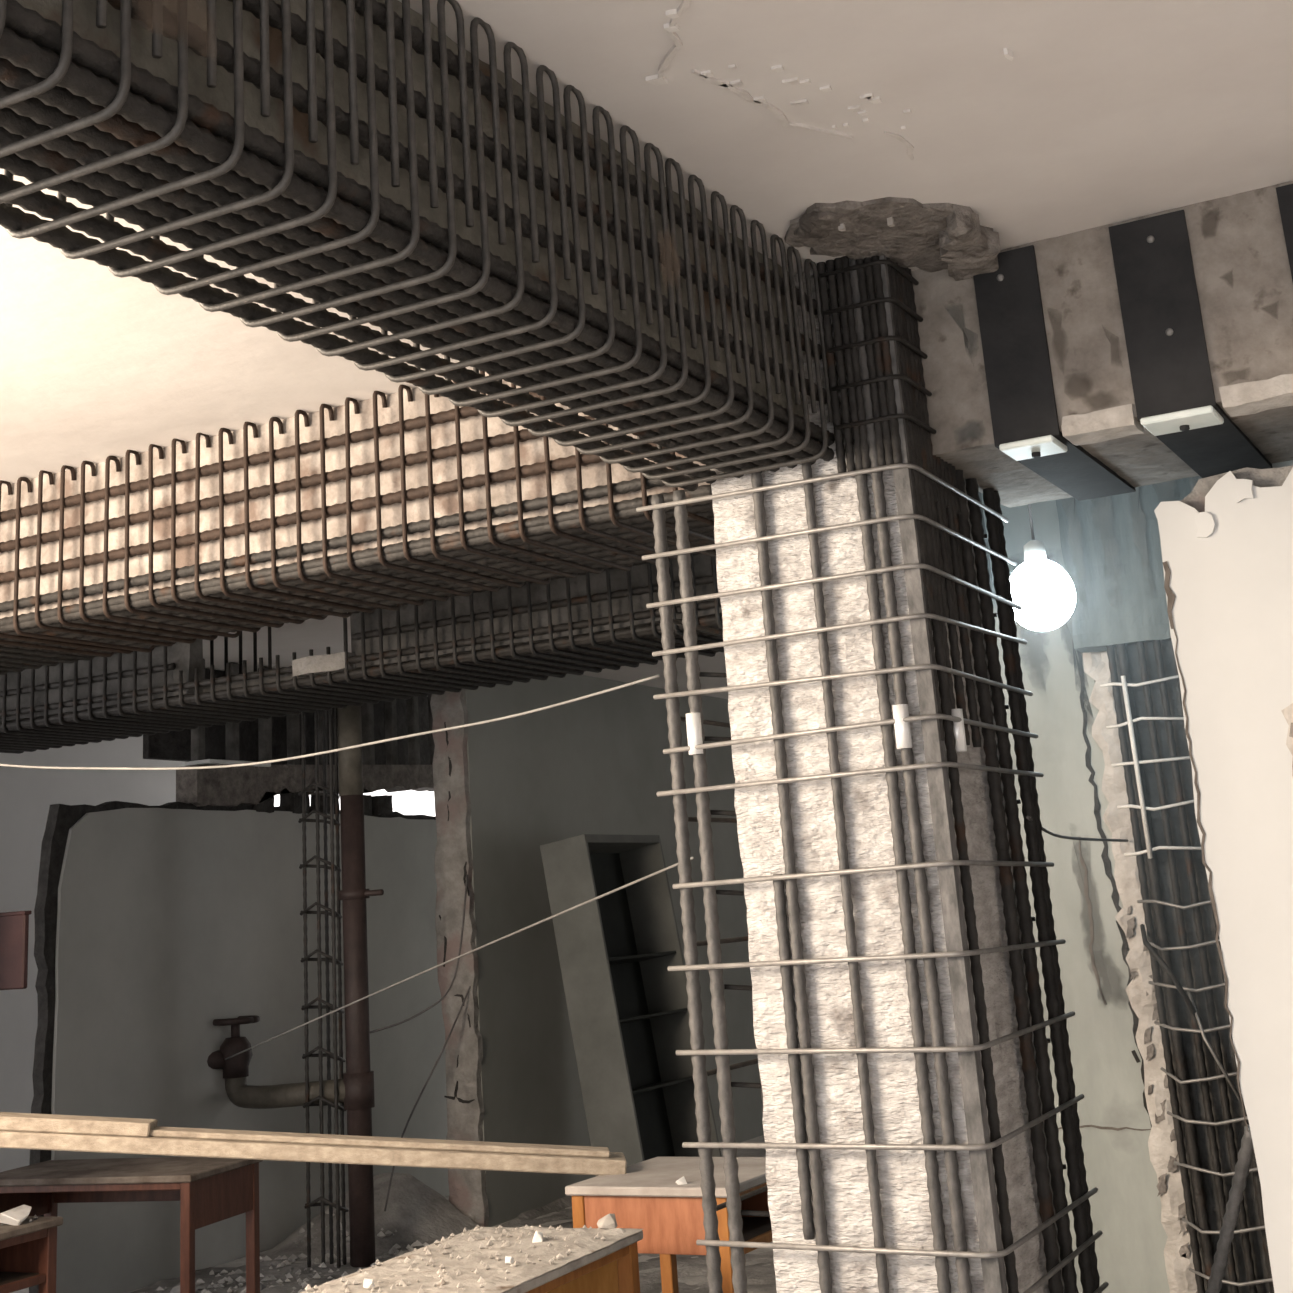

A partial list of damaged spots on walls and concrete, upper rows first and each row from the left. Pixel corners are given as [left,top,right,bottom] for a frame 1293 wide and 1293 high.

peeling [692,64,882,139]
spalling [785,197,1001,281]
flaking render [1195,512,1215,538]
flaking render [1234,479,1254,503]
flaking render [1282,703,1293,778]
flaking render [1162,561,1249,1132]
spalling [430,689,485,1141]
spalling [448,1168,489,1227]